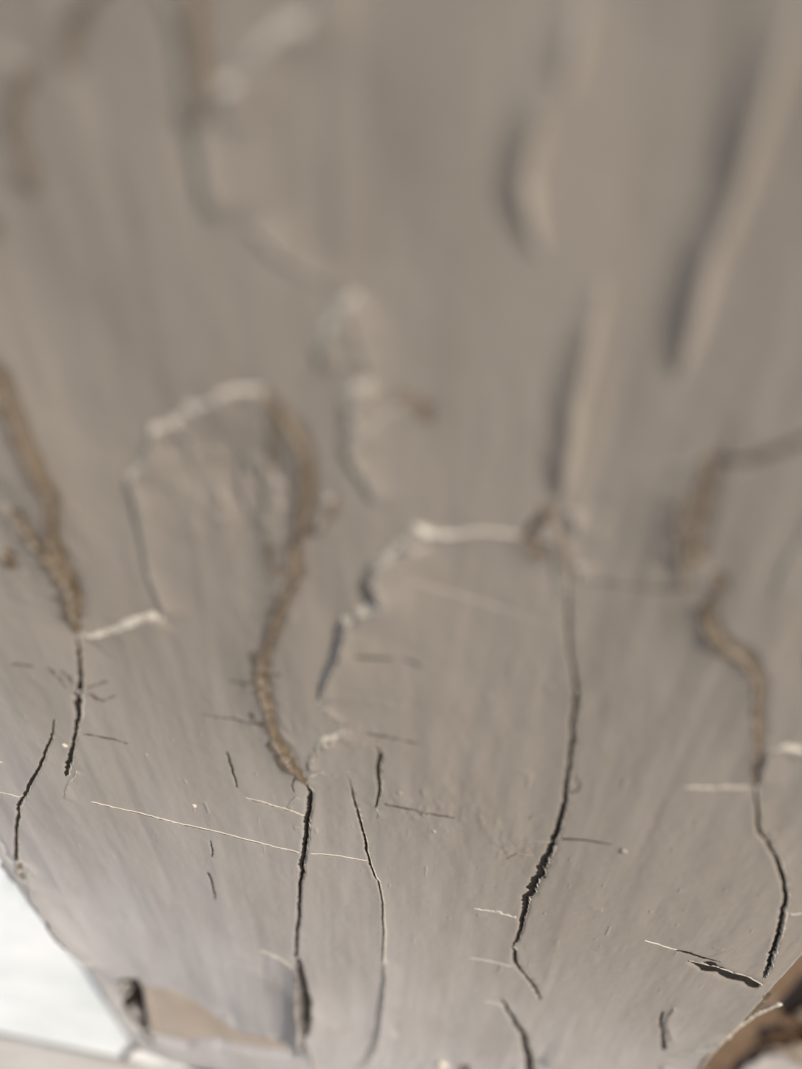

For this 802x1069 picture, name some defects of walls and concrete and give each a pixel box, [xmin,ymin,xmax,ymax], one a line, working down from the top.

peeling [82,386,263,639]
peeling [0,842,52,932]
crack [0,367,128,980]
peeling [80,962,304,1056]
crack [93,389,455,1069]
peeling [307,523,522,783]
crack [501,998,536,1069]
crack [511,573,611,1000]
crack [667,437,802,988]